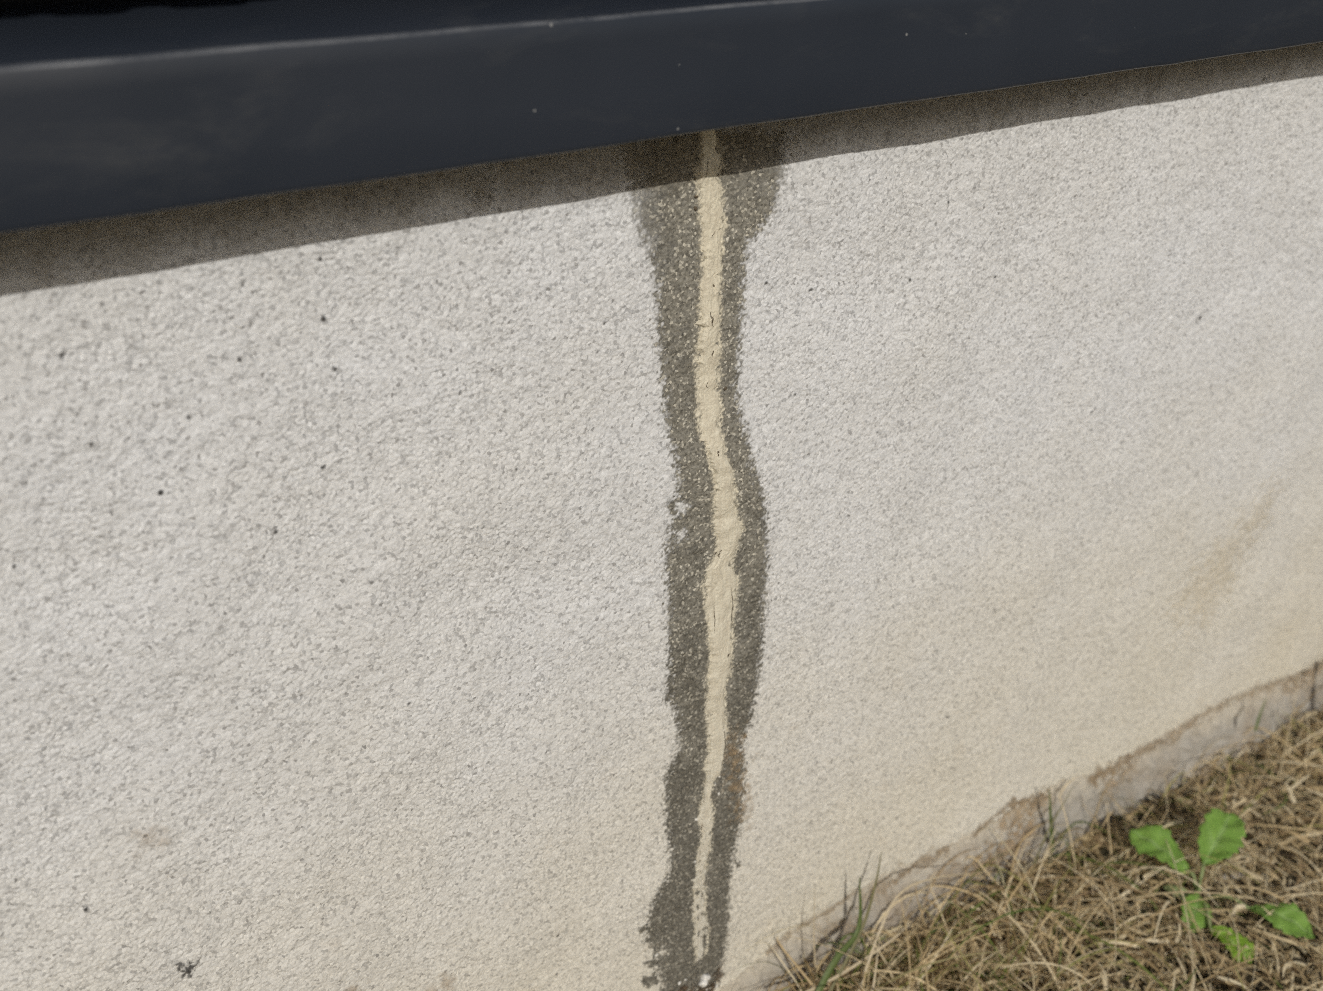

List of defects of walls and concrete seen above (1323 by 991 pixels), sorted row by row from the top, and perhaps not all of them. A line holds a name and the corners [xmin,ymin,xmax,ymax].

water stain [621,128,786,991]
crack [678,129,746,990]